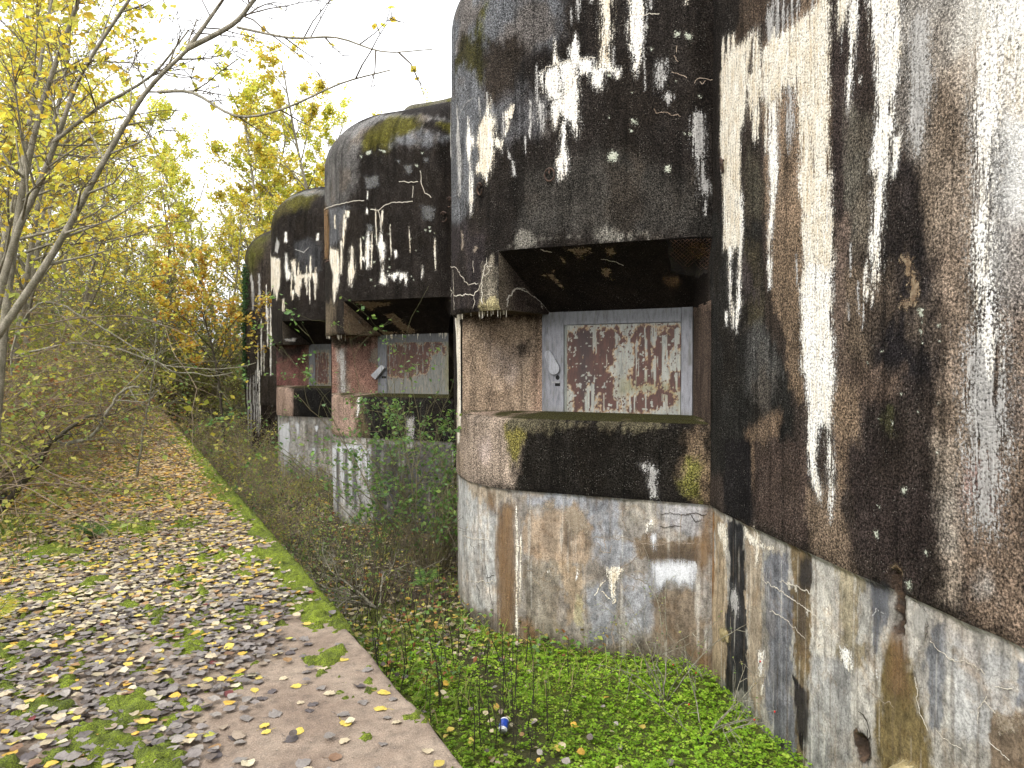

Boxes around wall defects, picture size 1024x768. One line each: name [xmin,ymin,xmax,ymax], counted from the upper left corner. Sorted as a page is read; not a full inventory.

efflorescence [247,232,319,437]
crack [324,171,431,232]
efflorescence [450,93,515,212]
crack [450,258,550,313]
efflorescence [524,0,672,180]
water stain [692,0,936,525]
efflorescence [957,0,1024,546]
corrosion [490,496,536,644]
crack [594,507,707,649]
spalling [853,727,871,763]
crack [858,681,961,761]
crack [904,564,1012,760]